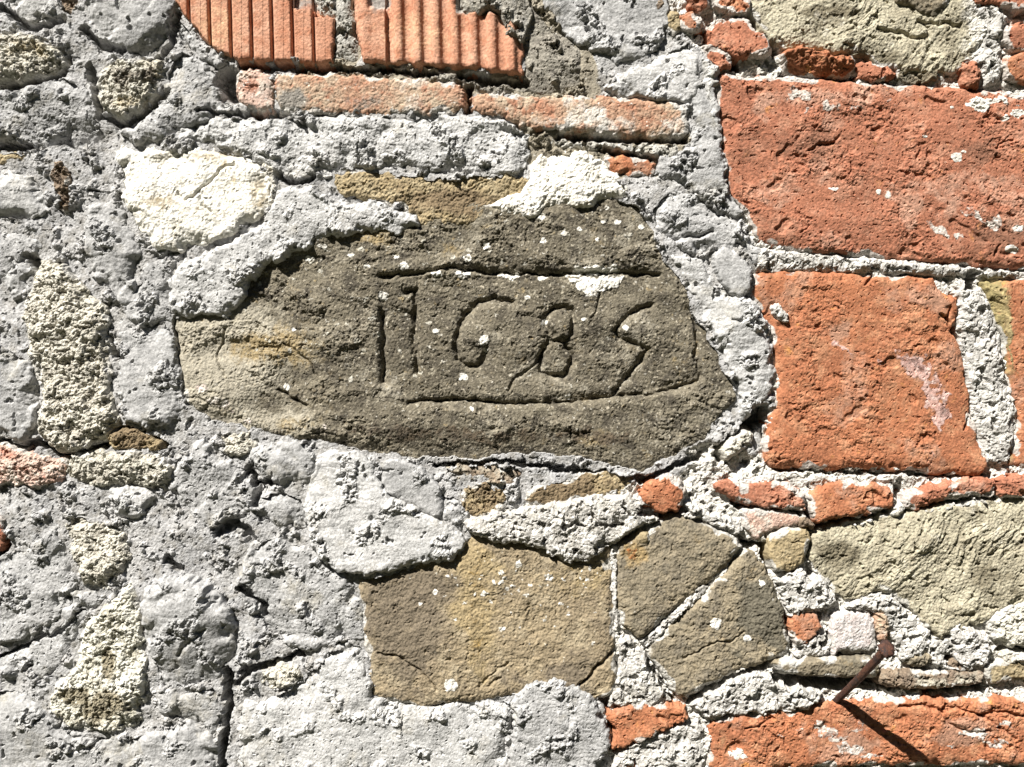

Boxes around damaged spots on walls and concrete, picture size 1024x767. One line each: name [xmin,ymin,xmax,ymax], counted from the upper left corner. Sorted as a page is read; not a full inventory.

crack [217,649,306,767]